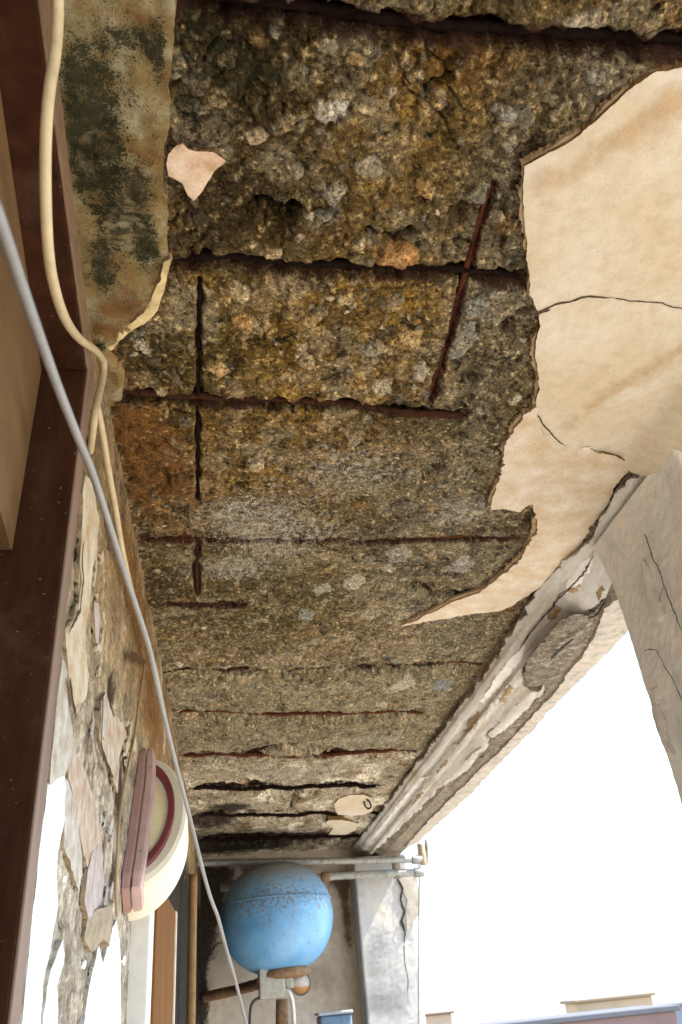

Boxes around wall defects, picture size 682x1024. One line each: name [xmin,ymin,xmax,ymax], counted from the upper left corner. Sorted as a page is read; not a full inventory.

leakage [58,0,281,354]
corrosion [93,284,147,342]
corrosion [107,180,527,422]
crack [534,296,682,316]
spalling [108,0,682,858]
crack [538,415,567,447]
corrosion [120,517,522,761]
crack [644,534,682,631]
crack [644,649,682,700]
peeling [19,475,137,1024]
crack [397,879,408,997]